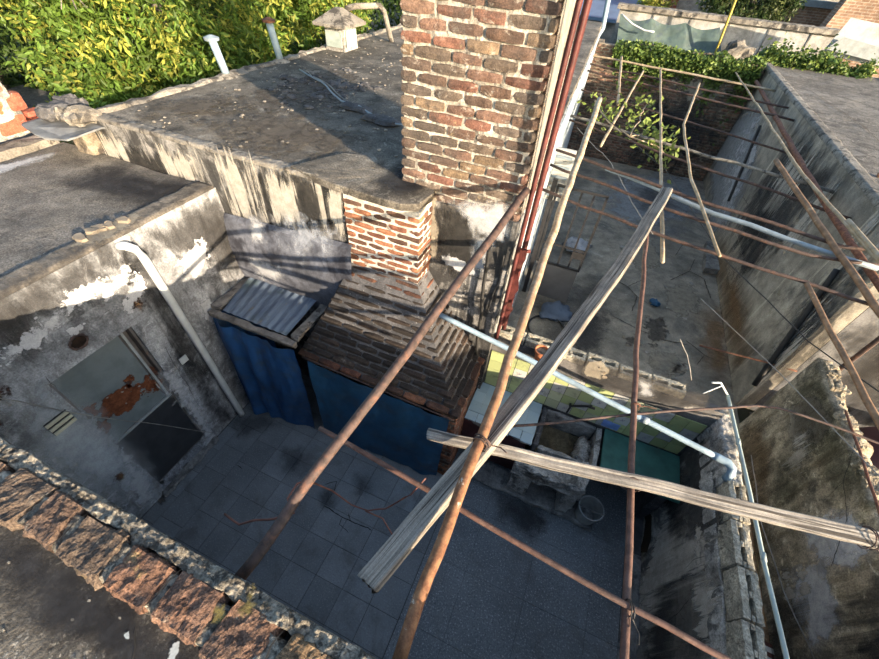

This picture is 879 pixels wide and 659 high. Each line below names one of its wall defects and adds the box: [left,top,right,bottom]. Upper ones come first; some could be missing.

leakage [66,131,205,209]
leakage [130,67,372,272]
peeling [174,237,211,281]
leakage [430,204,508,277]
peeling [0,265,148,367]
rust [81,366,163,435]
leakage [782,396,832,474]
leakage [781,533,867,643]